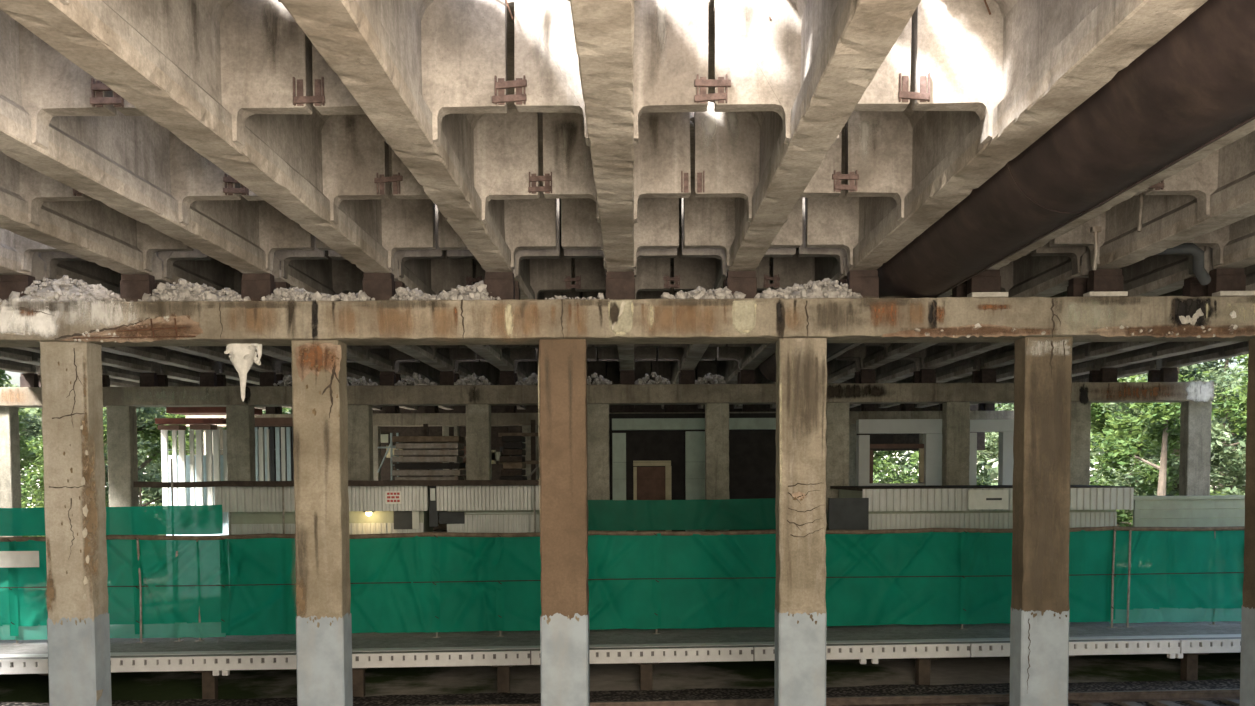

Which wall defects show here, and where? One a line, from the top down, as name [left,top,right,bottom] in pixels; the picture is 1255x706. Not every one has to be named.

spalling [59,315,203,343]
spalling [1091,308,1255,338]
rust [1126,325,1255,335]
crack [322,356,340,418]
crack [49,486,89,560]
crack [787,483,823,537]